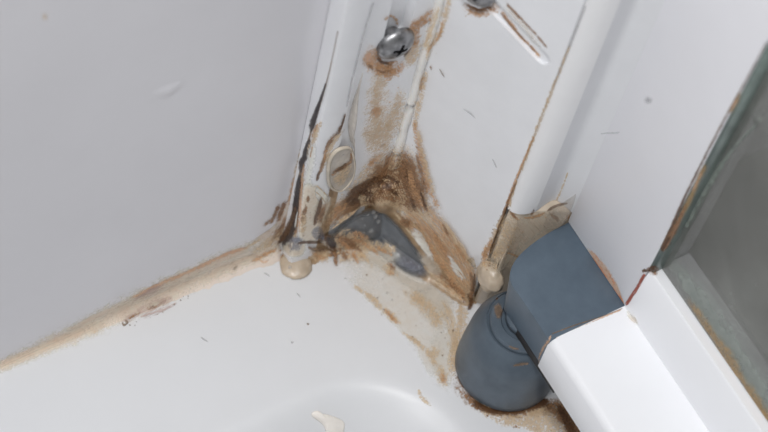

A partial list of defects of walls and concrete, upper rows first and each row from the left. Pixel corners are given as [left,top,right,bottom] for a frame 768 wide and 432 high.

rust [363,0,451,126]
rust [466,3,547,57]
crack [280,31,338,251]
leakage [298,114,440,286]
rust [397,48,569,309]
leakage [122,287,189,326]
leakage [355,286,468,386]